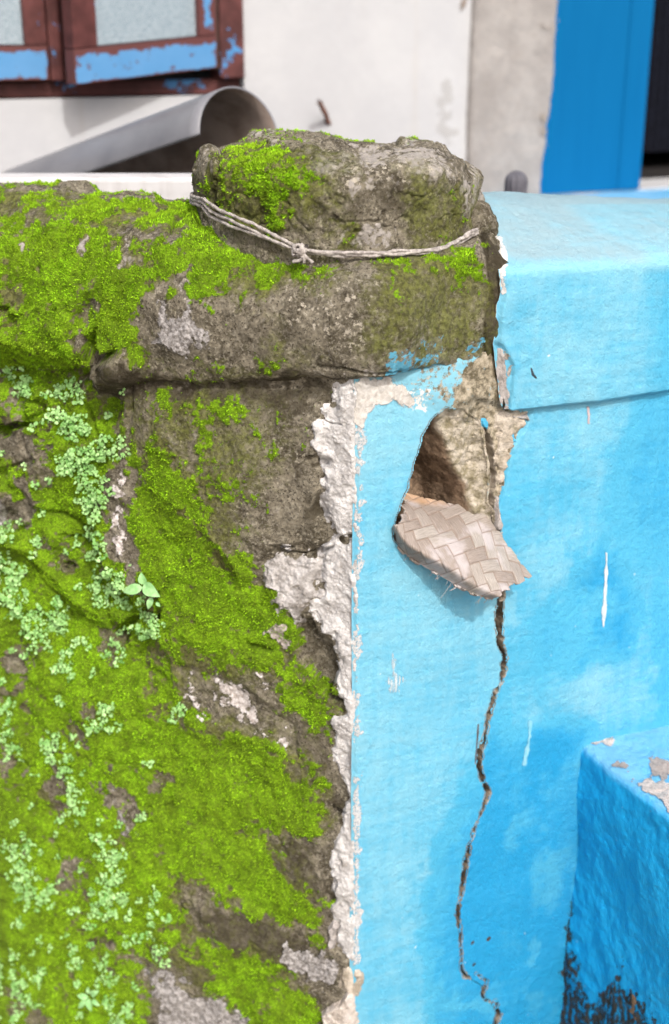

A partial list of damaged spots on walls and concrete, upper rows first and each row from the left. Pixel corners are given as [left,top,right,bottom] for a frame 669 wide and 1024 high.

crack [483,426,503,537]
spalling [481,348,530,530]
spalling [263,377,415,1024]
crack [454,590,509,1024]
peeling [612,756,669,812]
mould [558,895,657,1024]